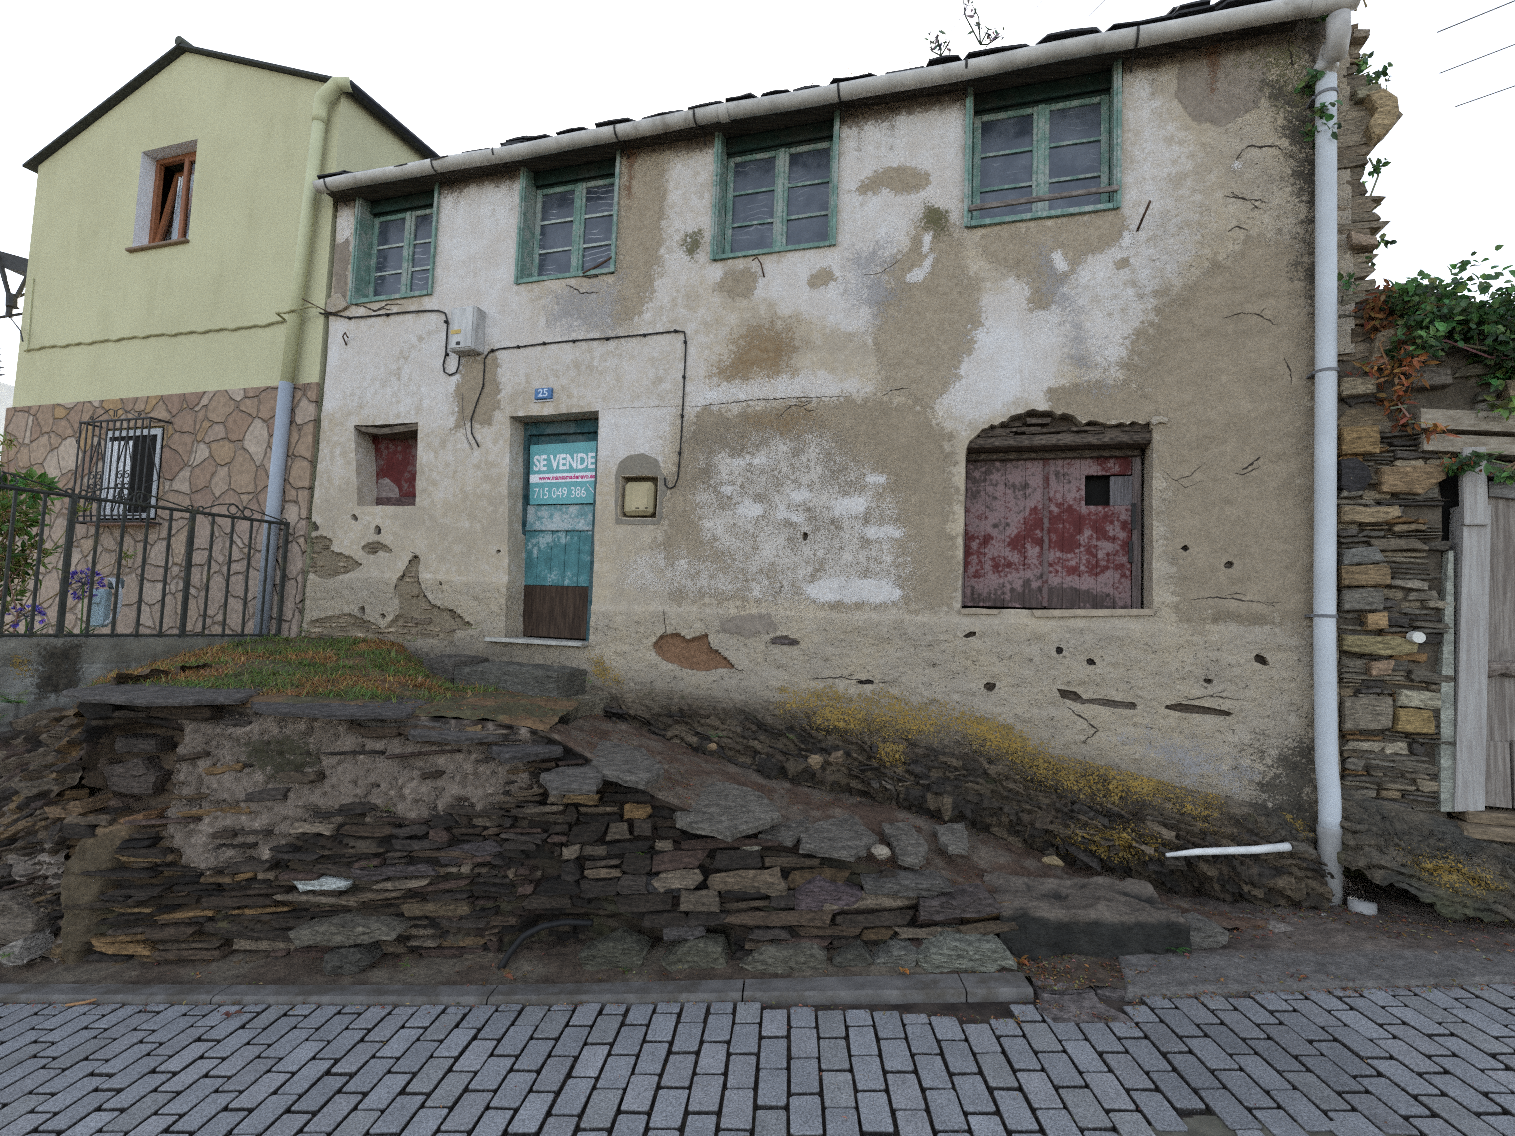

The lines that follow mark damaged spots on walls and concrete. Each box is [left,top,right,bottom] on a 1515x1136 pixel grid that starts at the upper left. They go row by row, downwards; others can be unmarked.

peeling [608,147,1138,622]
leakage [659,312,912,593]
peeling [1043,220,1315,665]
spalling [308,523,392,579]
spalling [306,555,472,642]
spalling [654,633,735,671]
spalling [771,636,799,646]
crack [1067,707,1098,742]
crack [1177,691,1243,702]